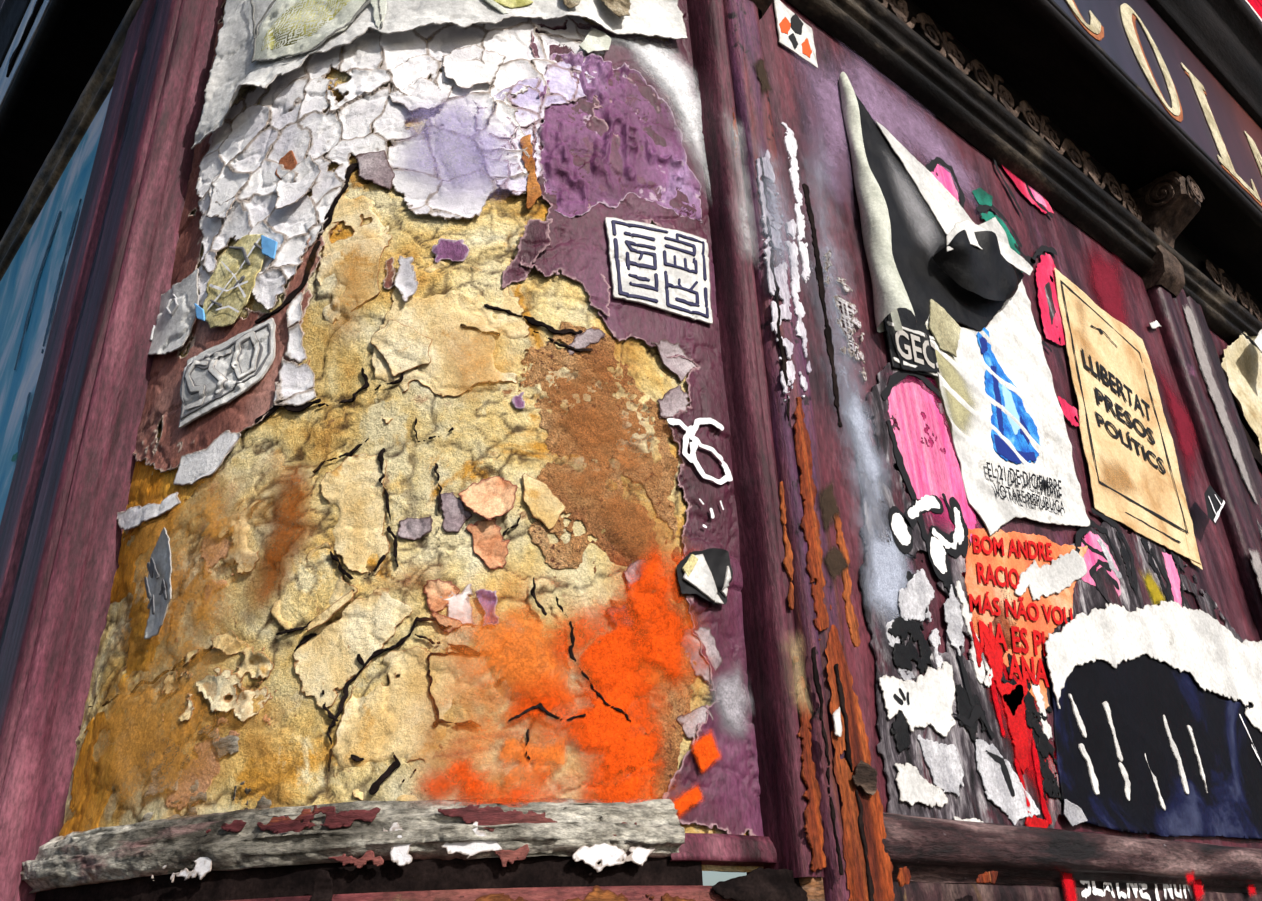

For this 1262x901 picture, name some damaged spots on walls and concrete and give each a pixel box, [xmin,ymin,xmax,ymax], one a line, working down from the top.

crack [760,157,790,421]
crack [802,183,843,428]
peeling [116,0,764,836]
peeling [756,122,911,901]
peeling [151,857,212,883]
peeling [206,781,413,868]
crack [322,617,482,795]
crack [35,855,808,901]
peeling [438,804,557,867]
crack [508,577,631,760]
peeling [545,820,656,901]
crack [811,647,877,901]